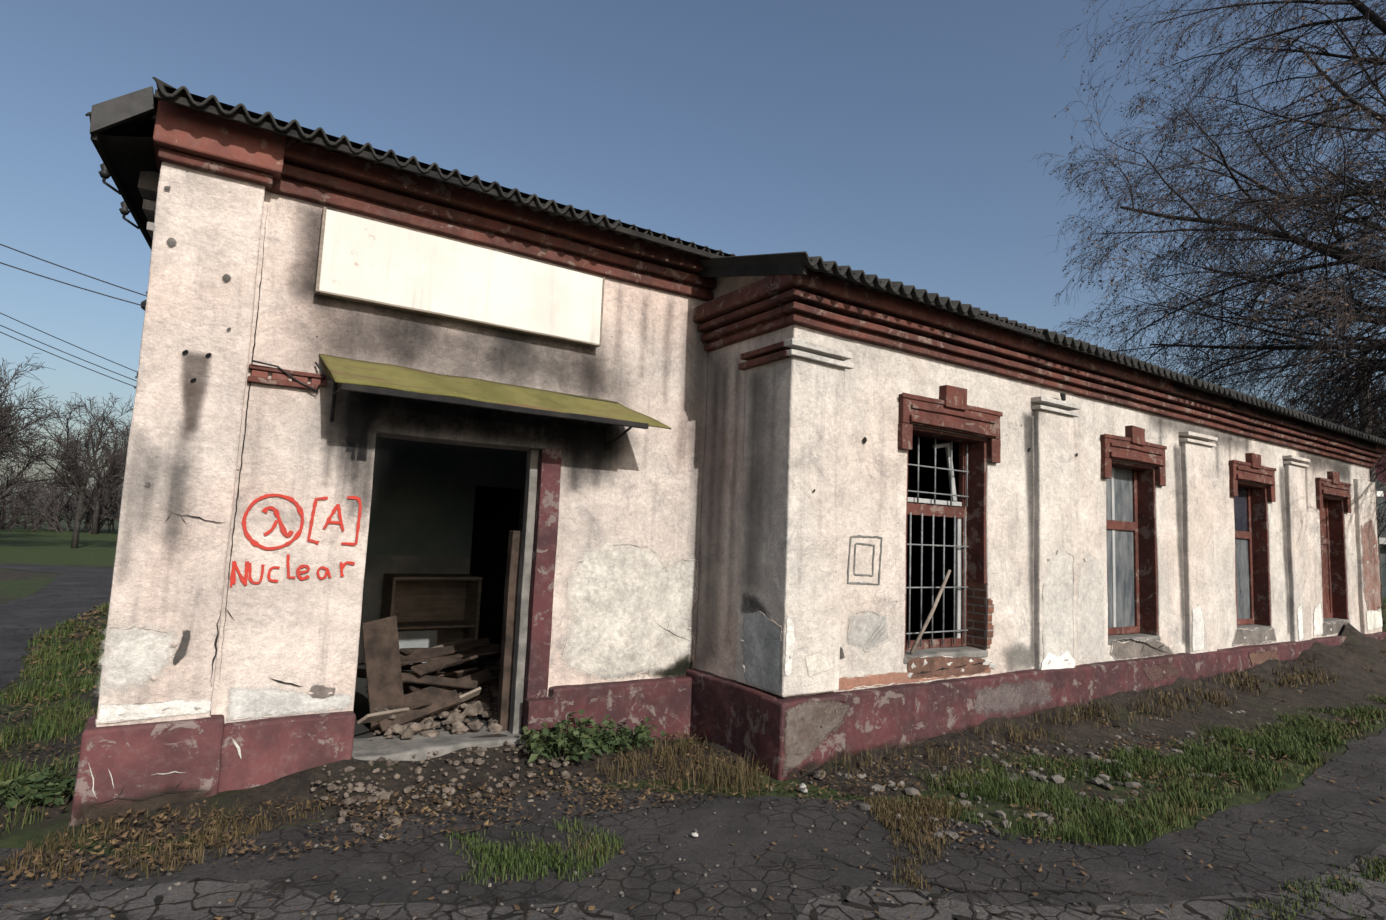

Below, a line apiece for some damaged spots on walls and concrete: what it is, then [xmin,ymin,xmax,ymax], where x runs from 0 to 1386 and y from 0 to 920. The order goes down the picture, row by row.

leakage [185,354,207,427]
crack [165,211,268,686]
flaking render [96,624,351,724]
flaking render [740,611,795,694]
spalling [782,582,998,775]
flaking render [1232,627,1279,666]
flaking render [1297,602,1348,641]
flaking render [1361,518,1383,631]